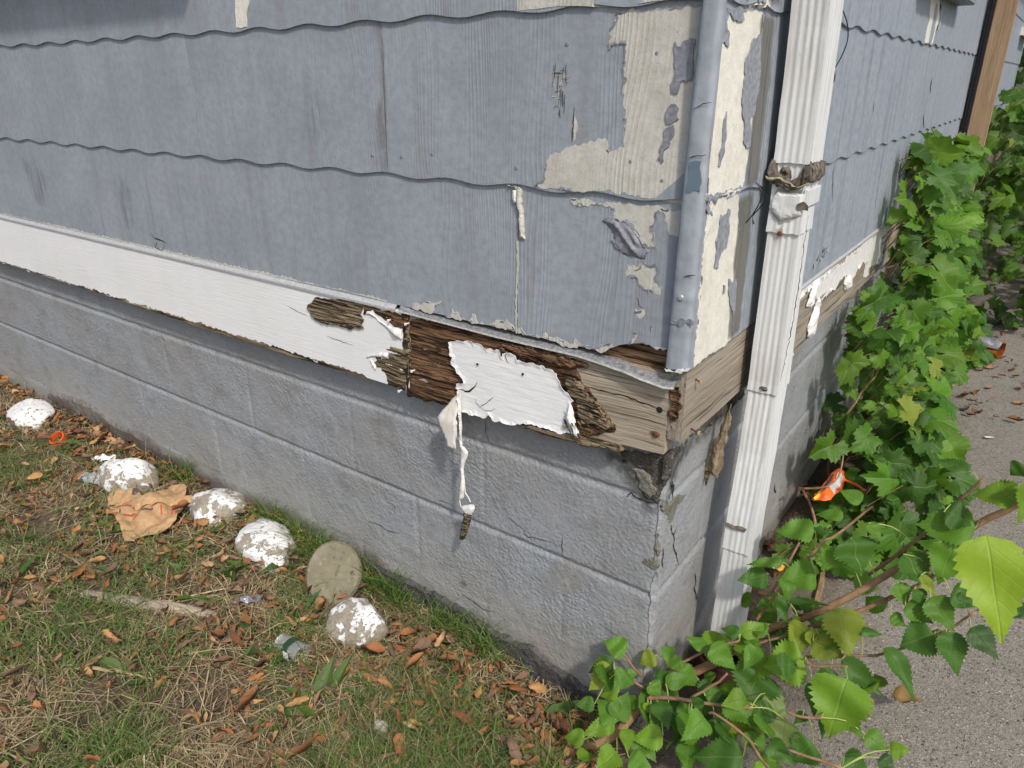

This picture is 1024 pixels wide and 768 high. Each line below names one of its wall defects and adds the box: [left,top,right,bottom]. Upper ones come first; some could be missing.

peeling [516,0,771,374]
peeling [366,312,402,340]
peeling [412,301,442,314]
peeling [446,310,613,353]
peeling [800,226,887,338]
peeling [437,340,579,540]
crack [627,481,686,504]
spalling [621,390,745,523]
spalling [642,533,661,570]
crack [662,525,697,599]